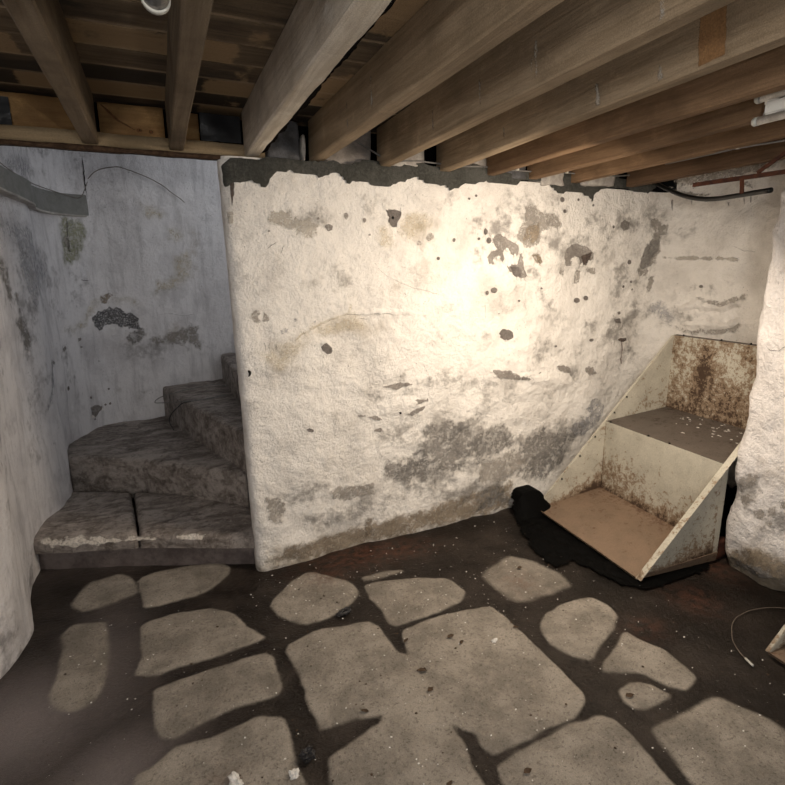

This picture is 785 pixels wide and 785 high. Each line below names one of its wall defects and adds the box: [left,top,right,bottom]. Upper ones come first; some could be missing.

peeling [478,228,528,282]
peeling [564,244,595,269]
water stain [274,399,604,560]
water stain [266,498,285,523]